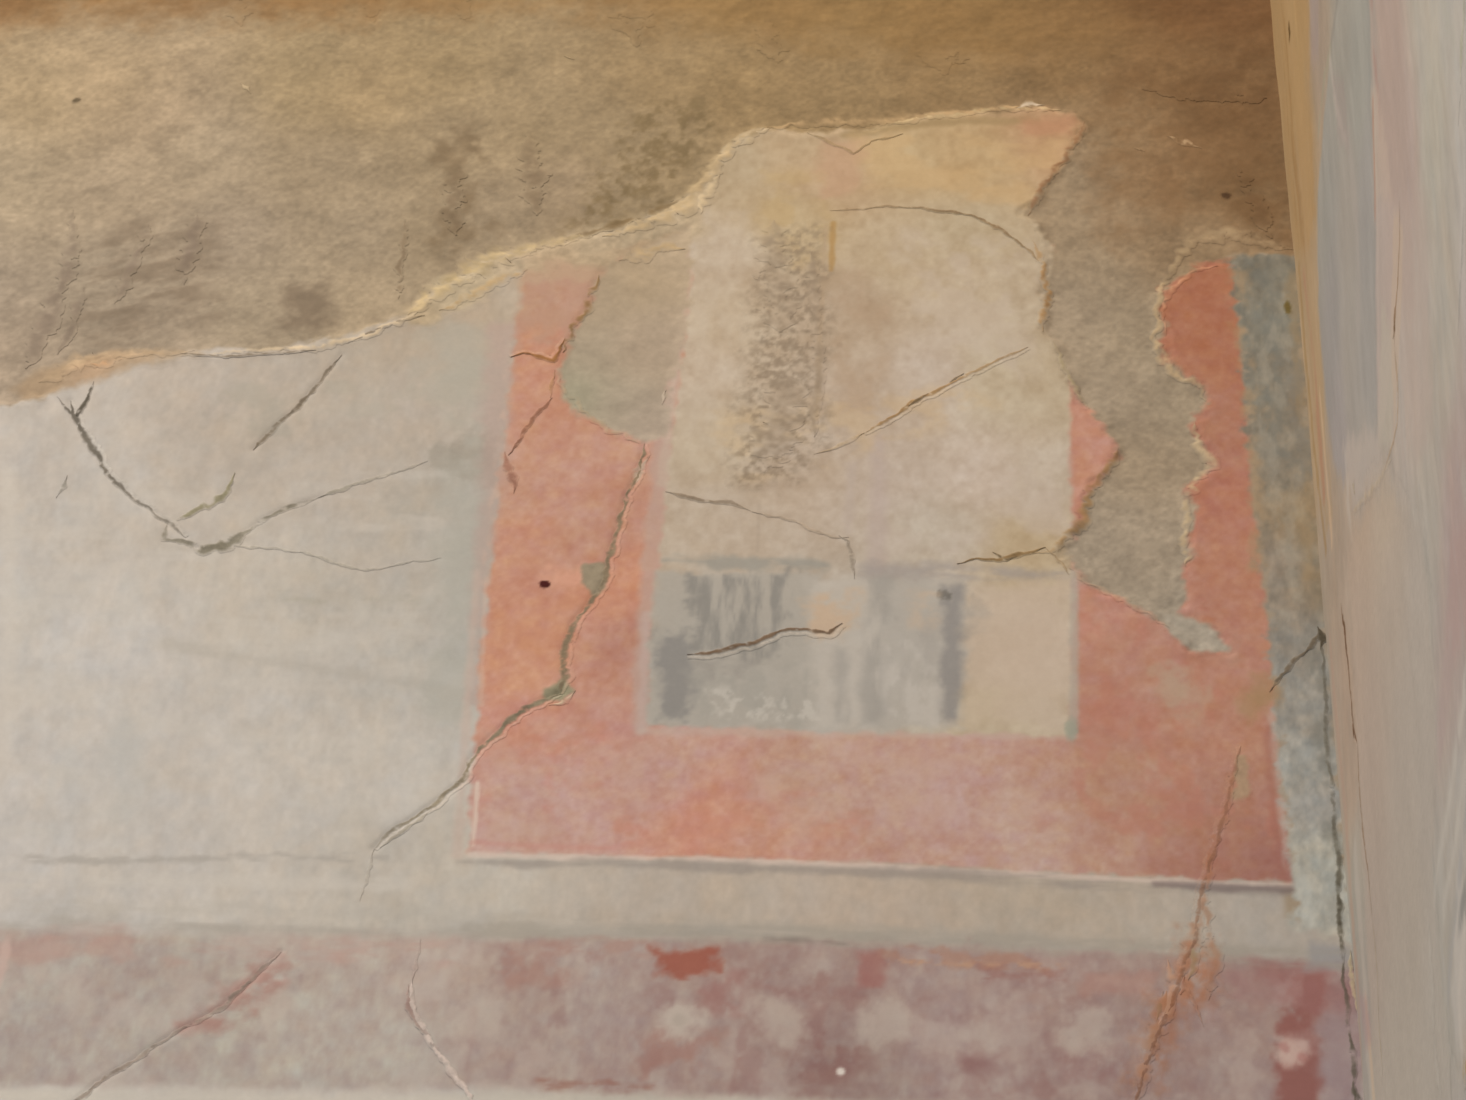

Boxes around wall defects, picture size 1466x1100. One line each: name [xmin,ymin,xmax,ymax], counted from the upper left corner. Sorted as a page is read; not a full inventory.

crack [57,356,438,571]
crack [502,338,565,491]
crack [360,443,856,899]
flaking render [0,17,1294,658]
crack [957,547,1068,573]
crack [73,952,281,1100]
crack [1130,745,1241,1100]
crack [1269,606,1383,1100]